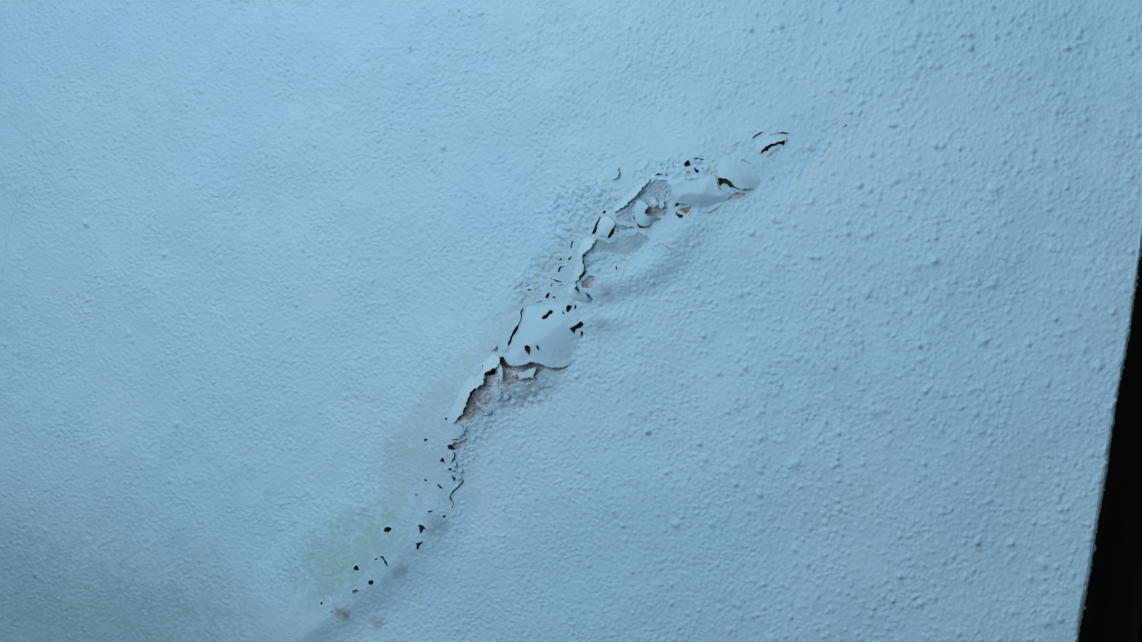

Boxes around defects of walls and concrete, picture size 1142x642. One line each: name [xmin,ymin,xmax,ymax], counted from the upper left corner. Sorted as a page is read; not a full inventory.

peeling [510,130,791,306]
flaking render [443,354,571,466]